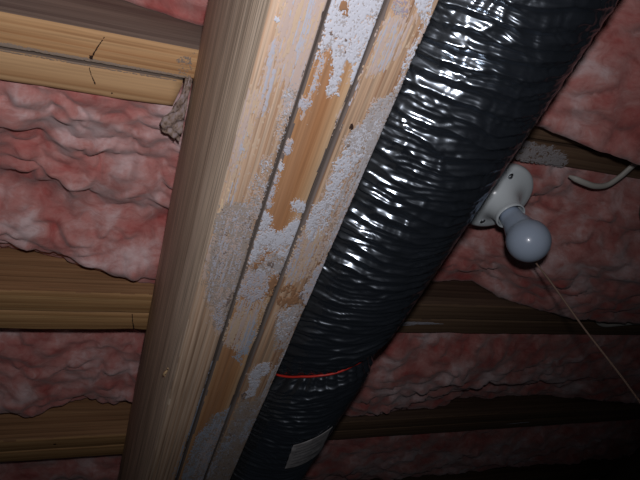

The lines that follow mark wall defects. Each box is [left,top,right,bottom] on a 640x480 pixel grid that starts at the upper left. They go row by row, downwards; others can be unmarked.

damp [170,0,434,480]